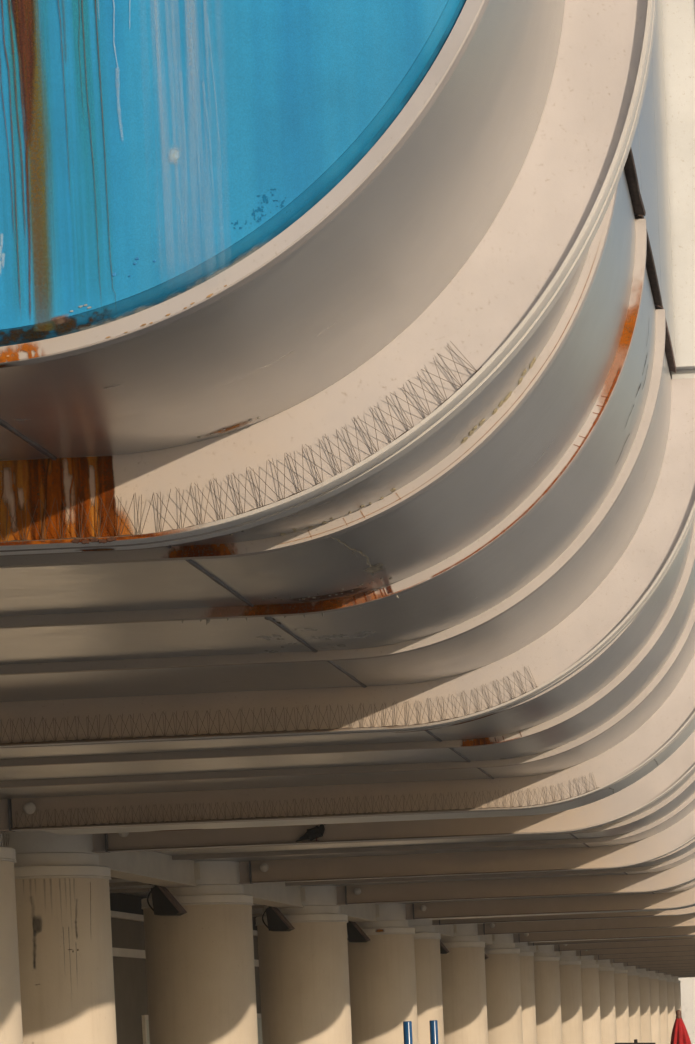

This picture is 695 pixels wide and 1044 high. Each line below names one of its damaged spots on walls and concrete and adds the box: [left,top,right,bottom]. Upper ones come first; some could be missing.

rust [0,0,100,368]
rust [78,0,113,285]
rust [0,456,235,558]
rust [197,417,260,438]
rust [243,301,640,616]